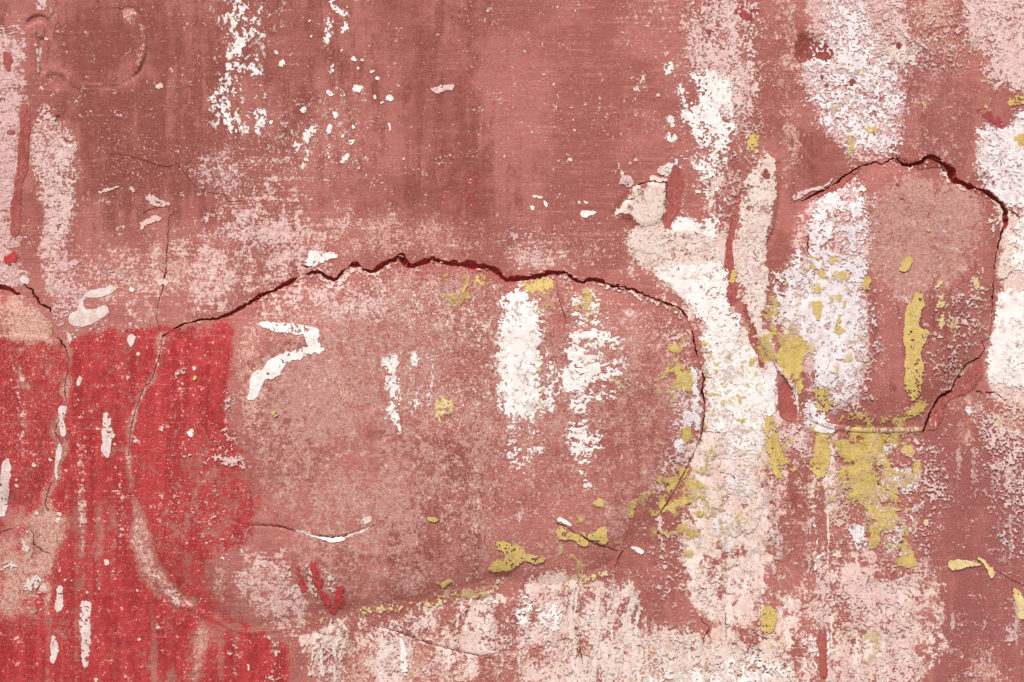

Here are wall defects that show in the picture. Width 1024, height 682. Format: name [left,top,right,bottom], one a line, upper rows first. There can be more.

crack [0,284,51,311]
peeling [0,24,80,284]
crack [54,339,70,444]
peeling [207,0,367,177]
peeling [184,250,402,400]
peeling [310,0,380,80]
peeling [326,84,400,104]
crack [128,206,766,534]
peeling [353,0,1024,682]
crack [793,154,1020,298]
crack [923,341,1017,430]
crack [253,524,348,538]